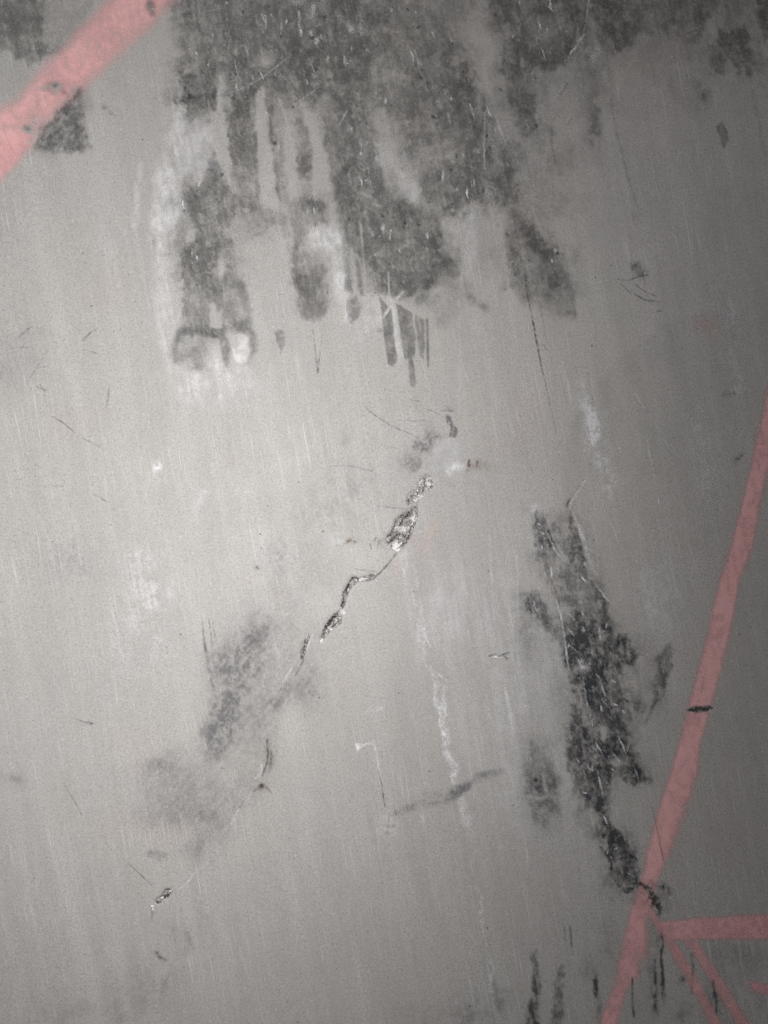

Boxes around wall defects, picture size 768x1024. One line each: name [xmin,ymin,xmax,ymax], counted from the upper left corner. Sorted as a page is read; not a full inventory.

leakage [129,60,283,424]
leakage [224,0,512,433]
leakage [512,224,559,288]
leakage [497,0,638,80]
leakage [391,447,718,890]